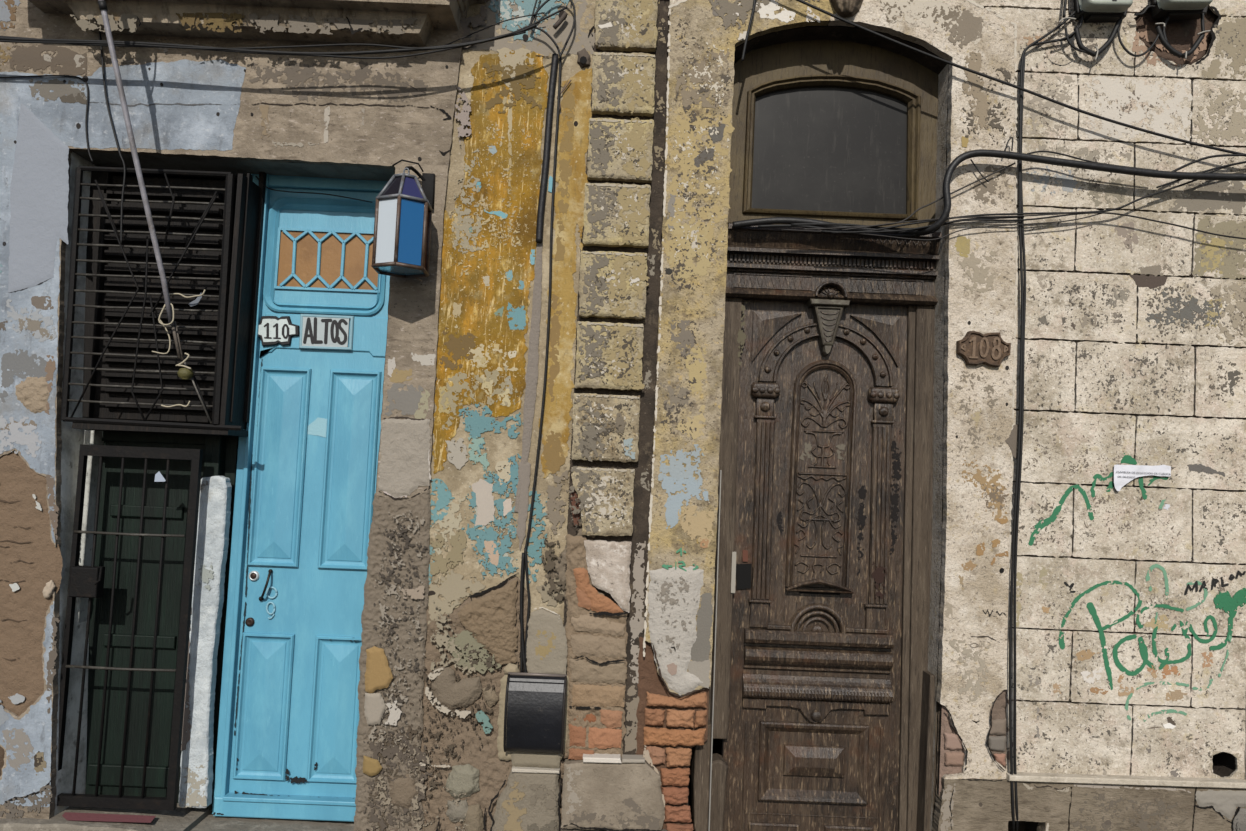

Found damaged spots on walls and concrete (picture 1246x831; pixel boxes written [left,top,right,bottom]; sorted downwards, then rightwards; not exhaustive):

flaking render [1135,7,1219,65]
flaking render [689,124,725,167]
peeling [1078,75,1193,145]
flaking render [350,119,709,831]
flaking render [0,296,63,776]
flaking render [939,705,964,795]
flaking render [988,690,1018,768]